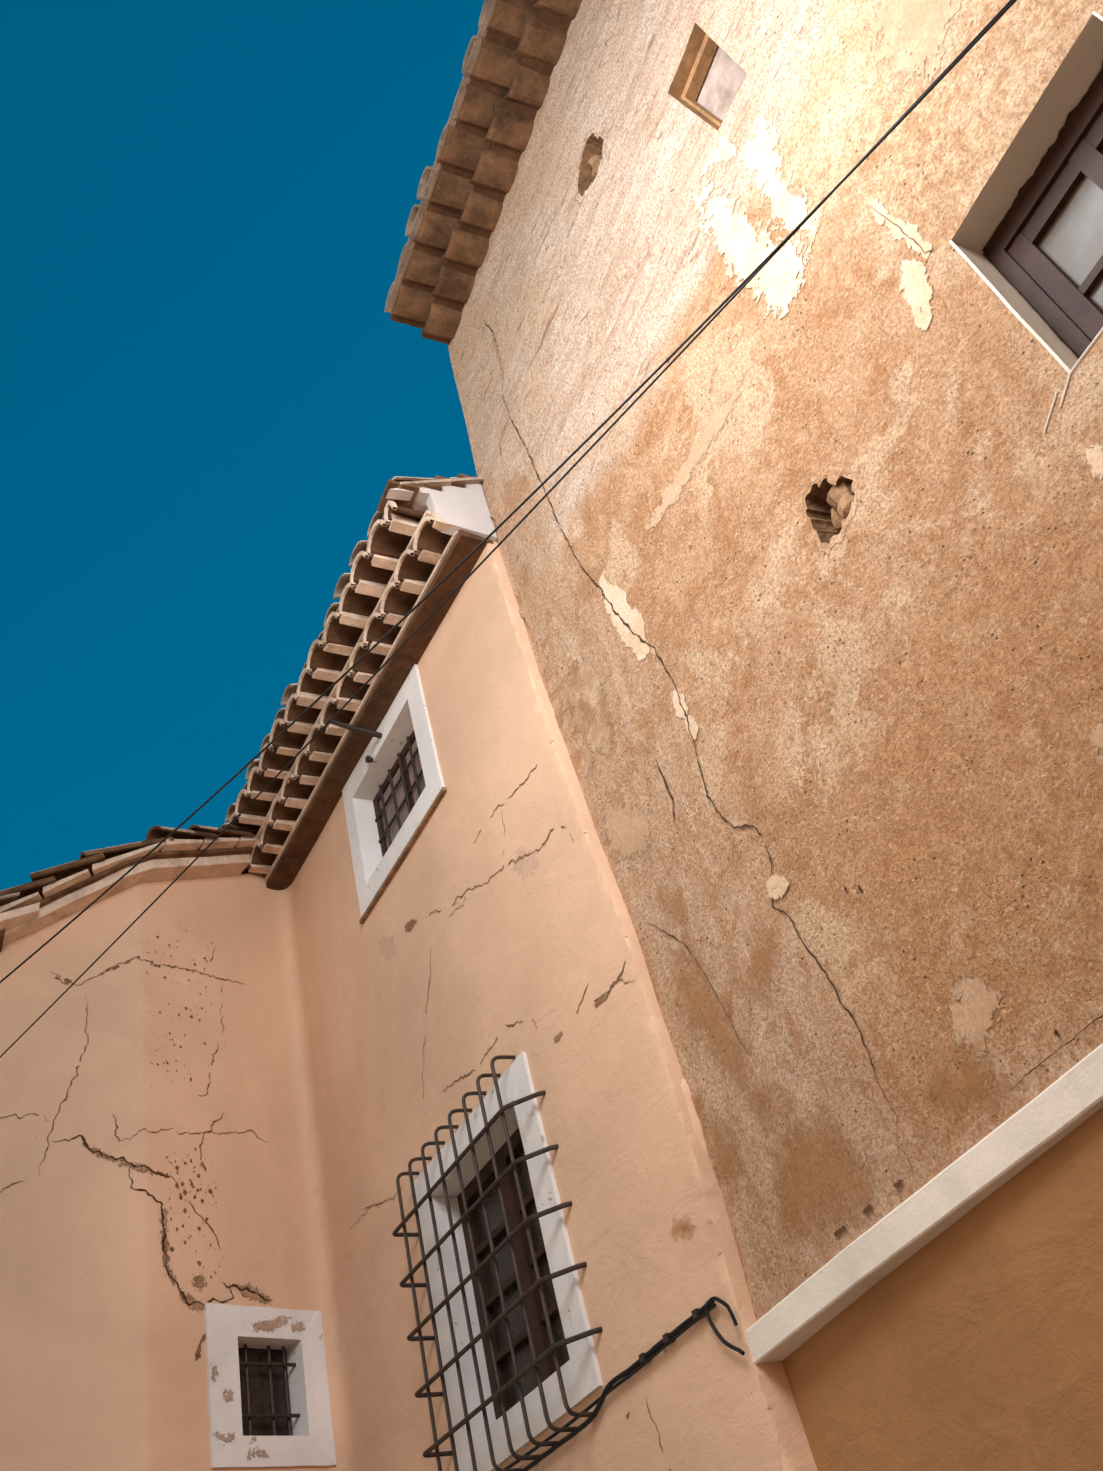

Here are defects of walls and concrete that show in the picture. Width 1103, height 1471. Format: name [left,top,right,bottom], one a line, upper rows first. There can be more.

spalling [575,129,607,204]
peeling [689,98,824,325]
spalling [802,471,861,556]
crack [483,319,920,1178]
crack [416,764,572,1006]
crack [0,948,273,1361]
crack [422,1020,537,1098]
crack [1008,1015,1103,1092]